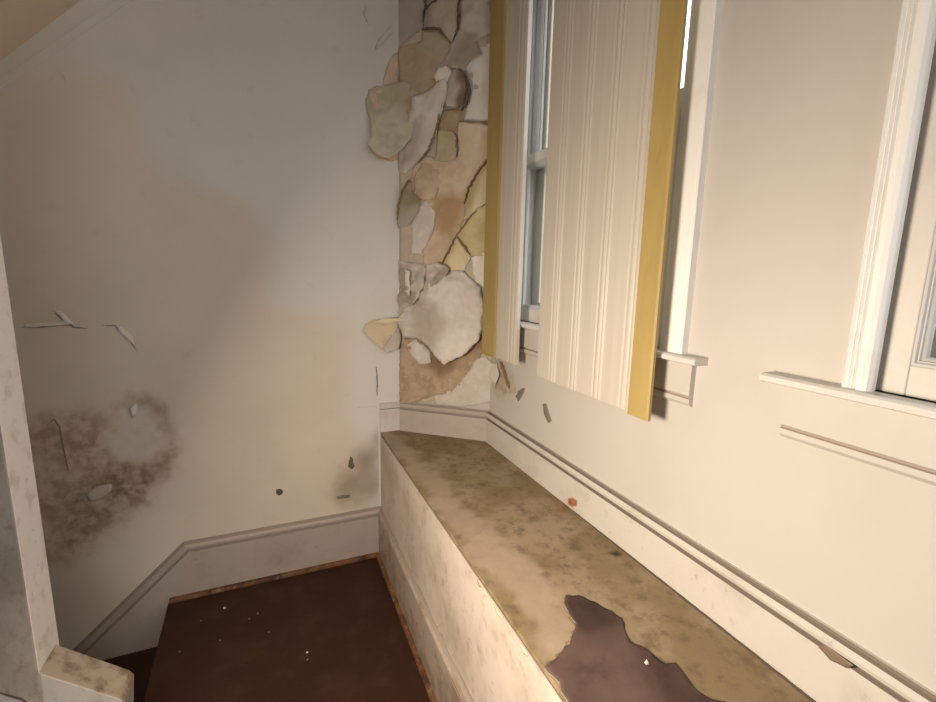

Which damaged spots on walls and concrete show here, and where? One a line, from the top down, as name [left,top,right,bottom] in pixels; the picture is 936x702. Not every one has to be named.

peeling [362,0,525,407]
peeling [545,595,725,702]